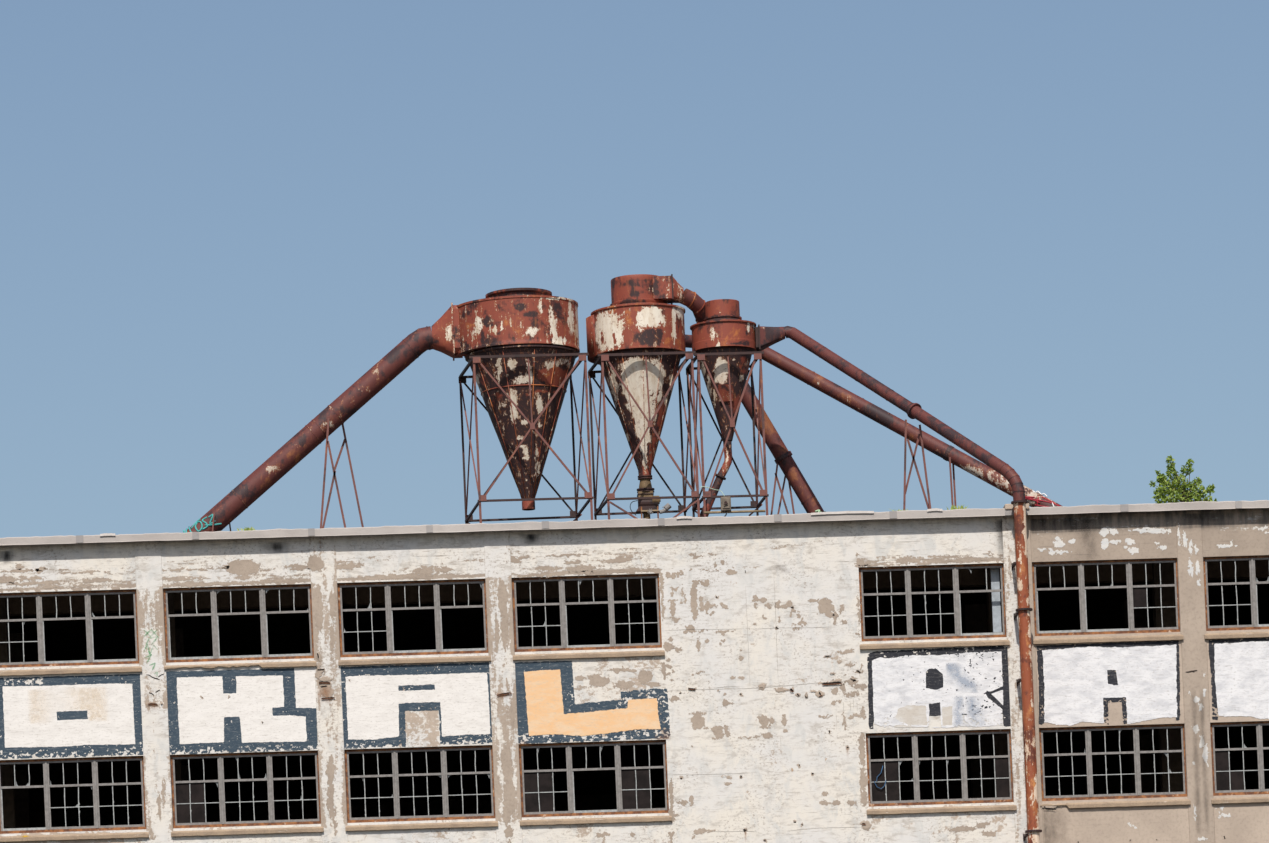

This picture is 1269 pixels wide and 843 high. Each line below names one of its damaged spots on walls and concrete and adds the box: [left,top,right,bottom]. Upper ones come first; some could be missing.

peeling [0,564,113,590]
peeling [1038,536,1076,555]
peeling [1099,527,1171,555]
peeling [494,553,737,691]
peeling [495,677,515,727]
peeling [689,711,788,740]
peeling [752,595,872,831]
peeling [149,777,166,840]
peeling [499,743,517,843]
peeling [668,778,694,843]